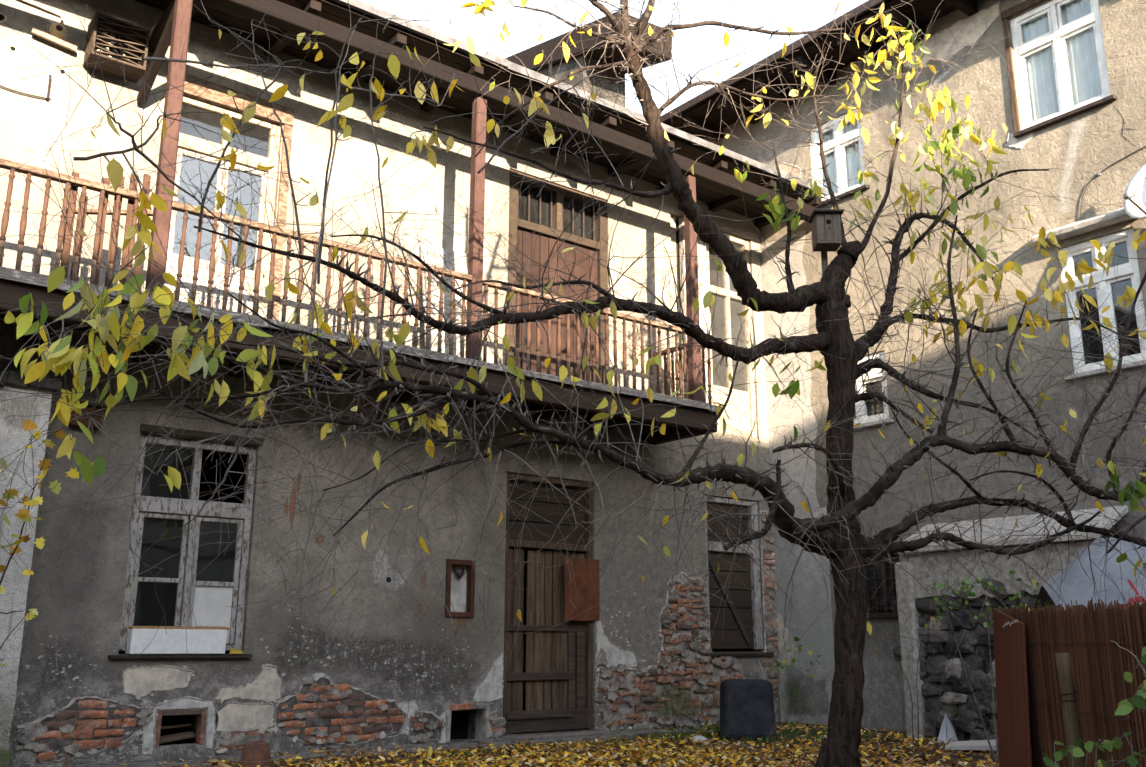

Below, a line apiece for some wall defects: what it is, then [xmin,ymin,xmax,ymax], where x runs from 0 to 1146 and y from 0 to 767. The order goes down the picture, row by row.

flaking render [0,604,506,767]
flaking render [595,571,745,730]
flaking render [757,510,798,713]